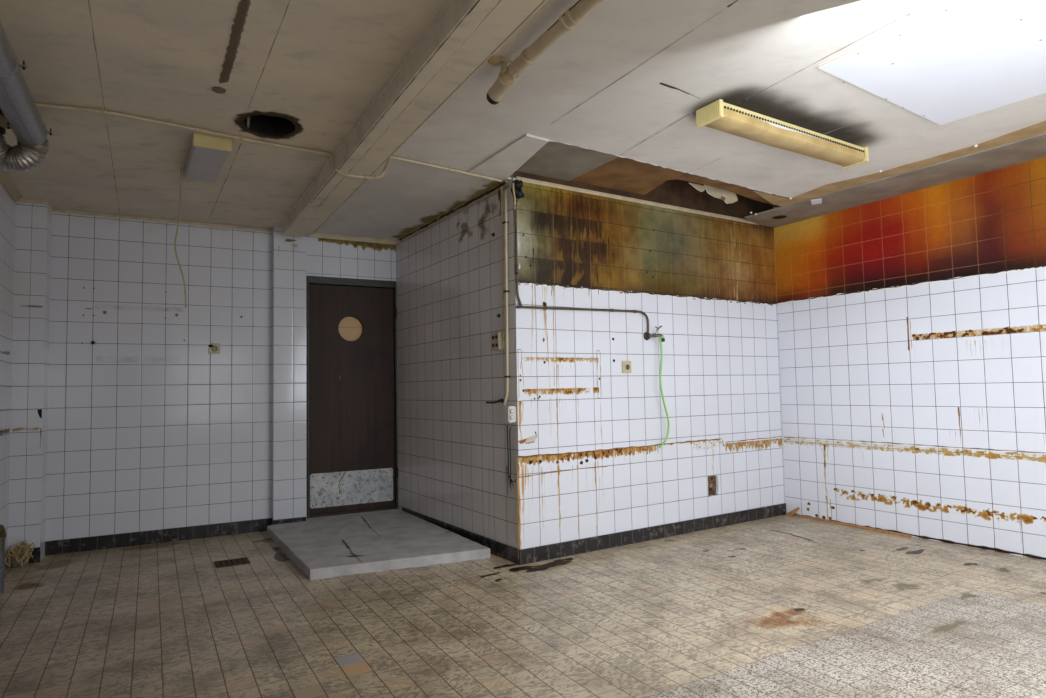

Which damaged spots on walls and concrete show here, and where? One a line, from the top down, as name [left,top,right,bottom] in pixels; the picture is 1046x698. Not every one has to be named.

peeling [549,120,1046,207]
rust [517,283,601,432]
rust [906,317,1046,351]
rust [516,407,1046,558]